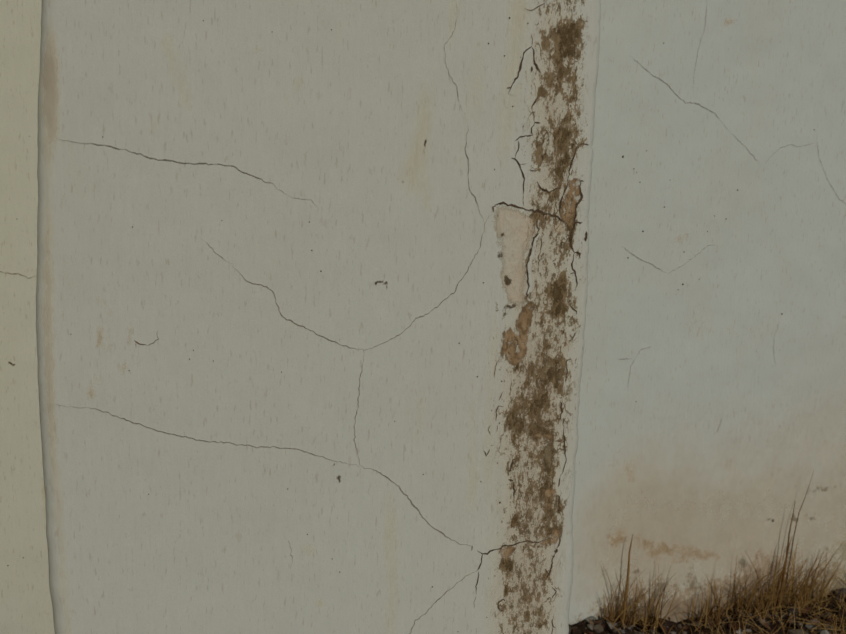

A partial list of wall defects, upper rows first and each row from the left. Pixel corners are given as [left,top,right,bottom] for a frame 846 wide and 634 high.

crack [508,34,541,95]
peeling [551,178,580,235]
peeling [494,207,536,365]
crack [59,98,589,633]